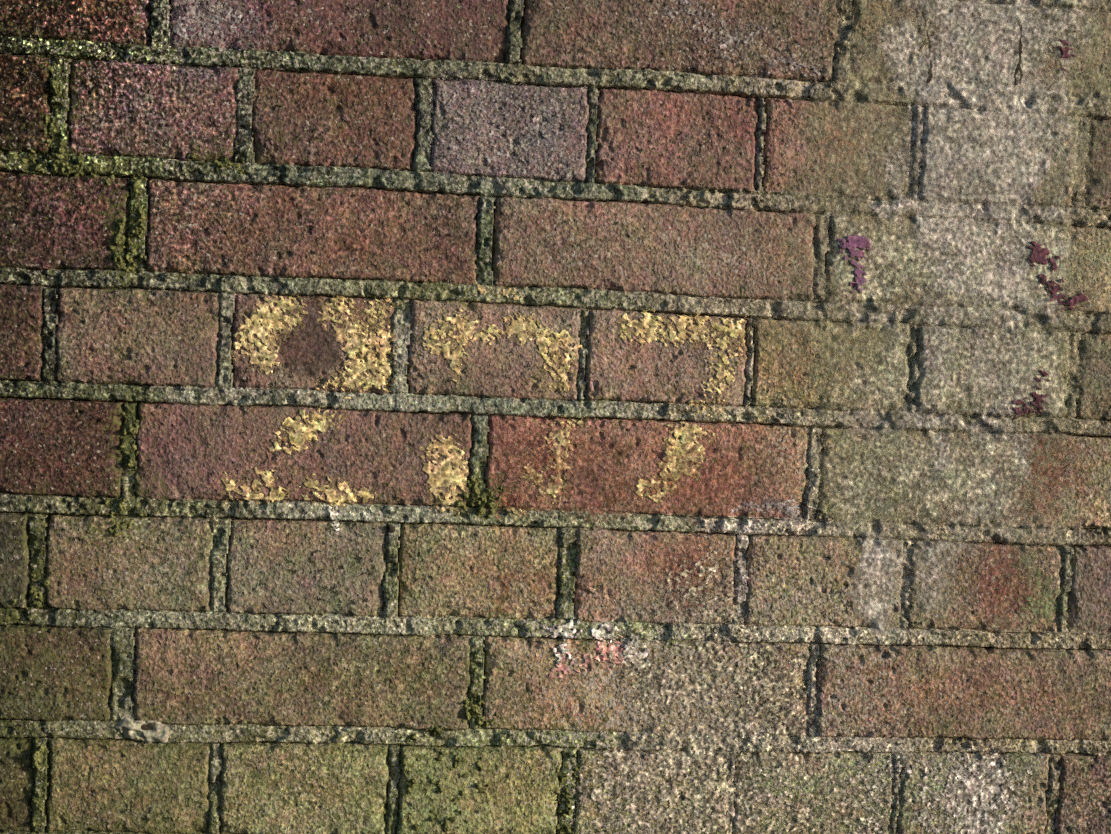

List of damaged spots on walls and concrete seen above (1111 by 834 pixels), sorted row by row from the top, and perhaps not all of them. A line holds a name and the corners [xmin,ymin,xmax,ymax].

damp [665,0,1111,634]
crack [1014,7,1023,87]